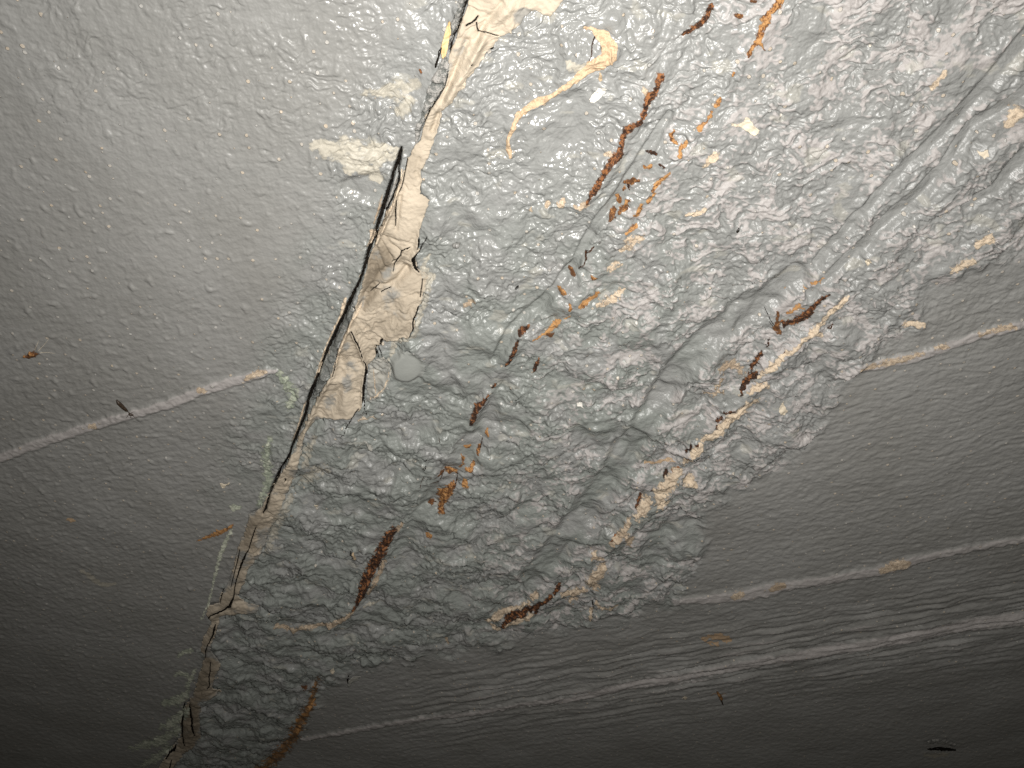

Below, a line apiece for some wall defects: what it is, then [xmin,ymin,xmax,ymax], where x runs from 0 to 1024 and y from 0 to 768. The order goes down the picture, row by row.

peeling [414,57,449,146]
spalling [437,0,458,59]
crack [434,0,468,68]
peeling [445,0,465,60]
peeling [506,26,618,159]
rust [545,73,665,211]
rust [682,3,714,36]
rust [747,0,784,58]
spalling [256,80,432,509]
rust [420,150,671,515]
rust [702,278,830,398]
crack [165,146,402,768]